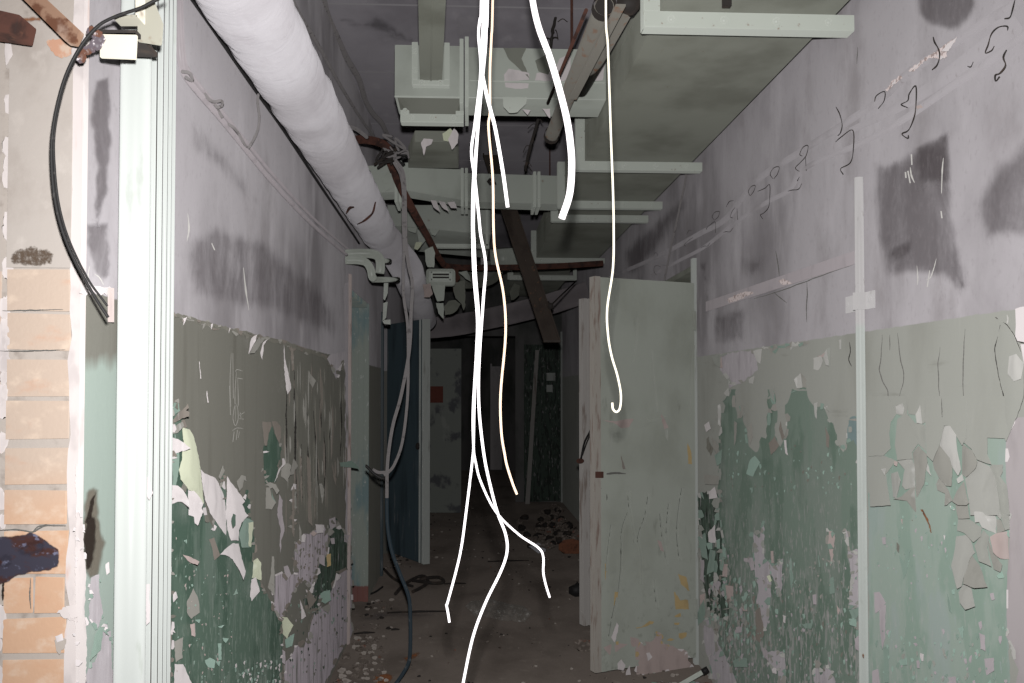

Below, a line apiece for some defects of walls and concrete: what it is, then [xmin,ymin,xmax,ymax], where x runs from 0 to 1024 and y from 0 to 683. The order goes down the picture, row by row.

mould [11,247,52,266]
crack [879,333,904,396]
crack [937,335,965,413]
crack [994,315,1024,396]
peeling [170,282,359,683]
peeling [667,340,1024,683]
peeling [55,463,113,683]